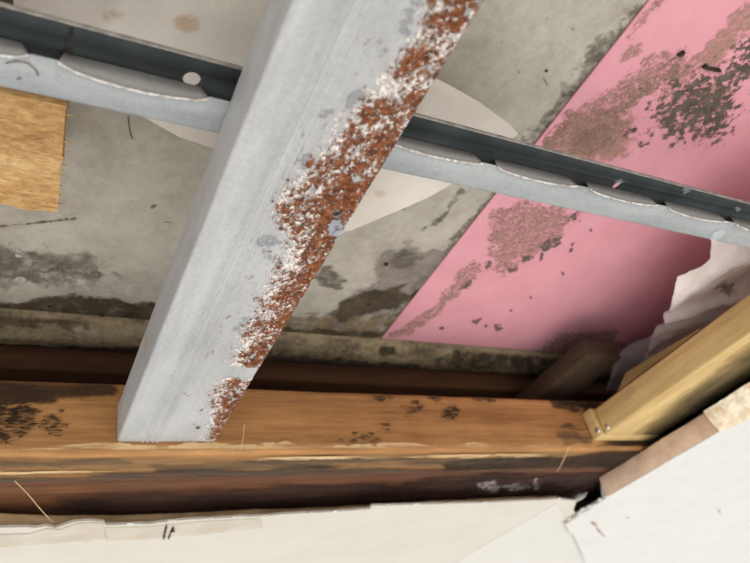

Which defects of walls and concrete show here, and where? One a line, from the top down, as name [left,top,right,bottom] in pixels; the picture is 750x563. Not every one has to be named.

water stain [543,3,750,162]
corrosion [219,0,483,368]
water stain [0,381,116,443]
water stain [0,247,156,352]
corrosion [193,377,253,442]
water stain [268,347,421,369]
water stain [62,355,750,514]
water stain [282,201,580,338]
water stain [437,330,625,373]